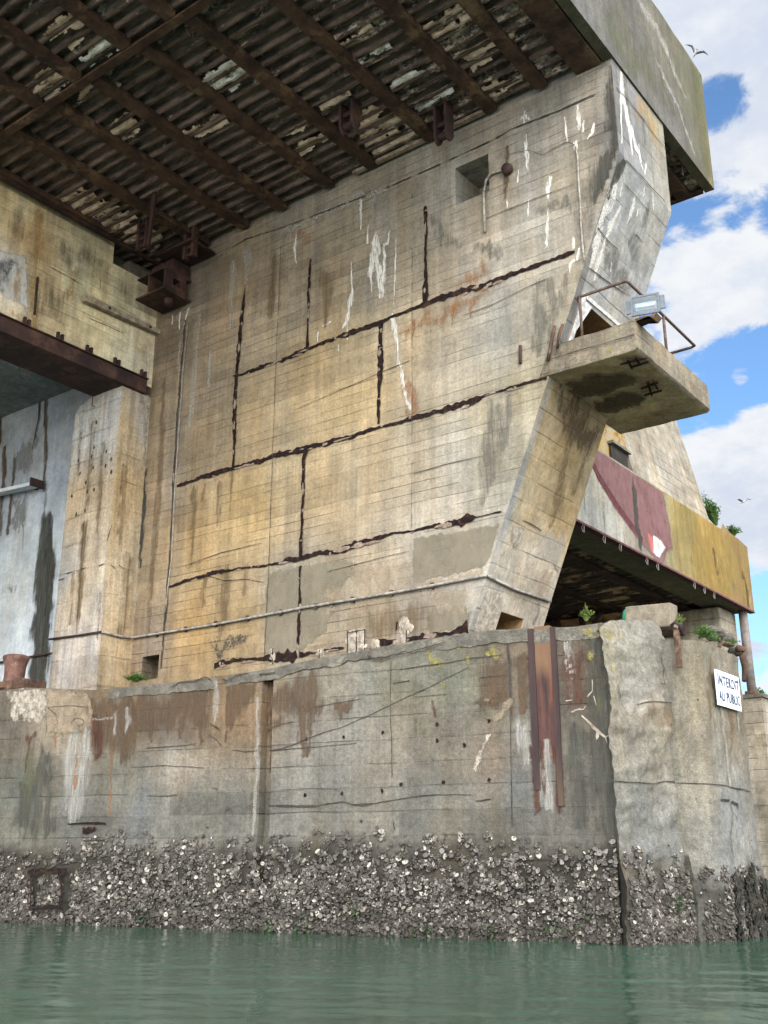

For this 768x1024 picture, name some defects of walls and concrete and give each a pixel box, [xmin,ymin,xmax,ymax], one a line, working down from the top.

spalling [43,13,119,67]
spalling [202,60,246,93]
spalling [58,186,163,252]
damp [564,68,654,291]
damp [341,189,412,410]
damp [554,374,645,518]
crack [131,206,634,789]
damp [28,512,56,681]
spalling [7,688,92,735]
corrosion [91,715,112,760]
crack [508,773,516,827]
corrosion [530,733,561,814]